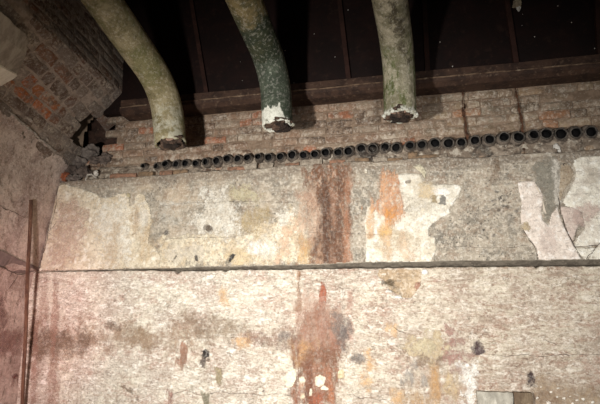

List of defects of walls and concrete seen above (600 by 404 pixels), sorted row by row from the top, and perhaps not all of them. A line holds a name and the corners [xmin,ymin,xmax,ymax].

spalling [83,117,117,156]
corrosion [295,162,352,278]
corrosion [367,168,403,246]
peeling [355,152,462,299]
peeling [518,156,600,260]
crack [558,198,600,261]
corrosion [290,282,345,404]